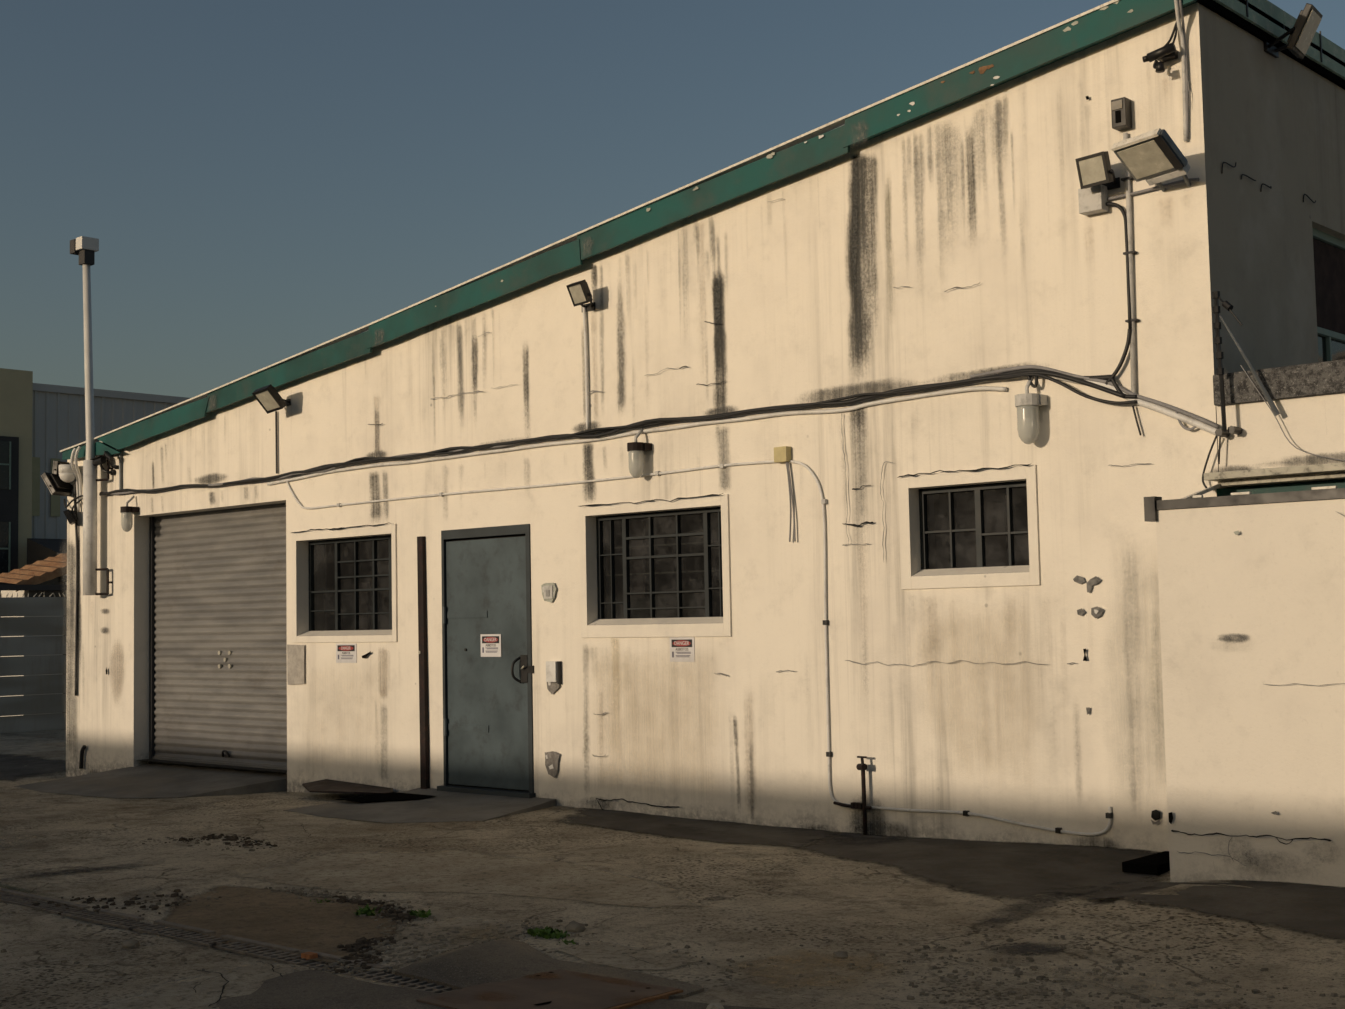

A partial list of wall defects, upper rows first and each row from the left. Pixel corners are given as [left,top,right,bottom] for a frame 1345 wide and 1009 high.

damp [962,138,975,219]
damp [848,156,890,363]
damp [457,326,477,410]
damp [707,275,733,415]
damp [811,382,909,499]